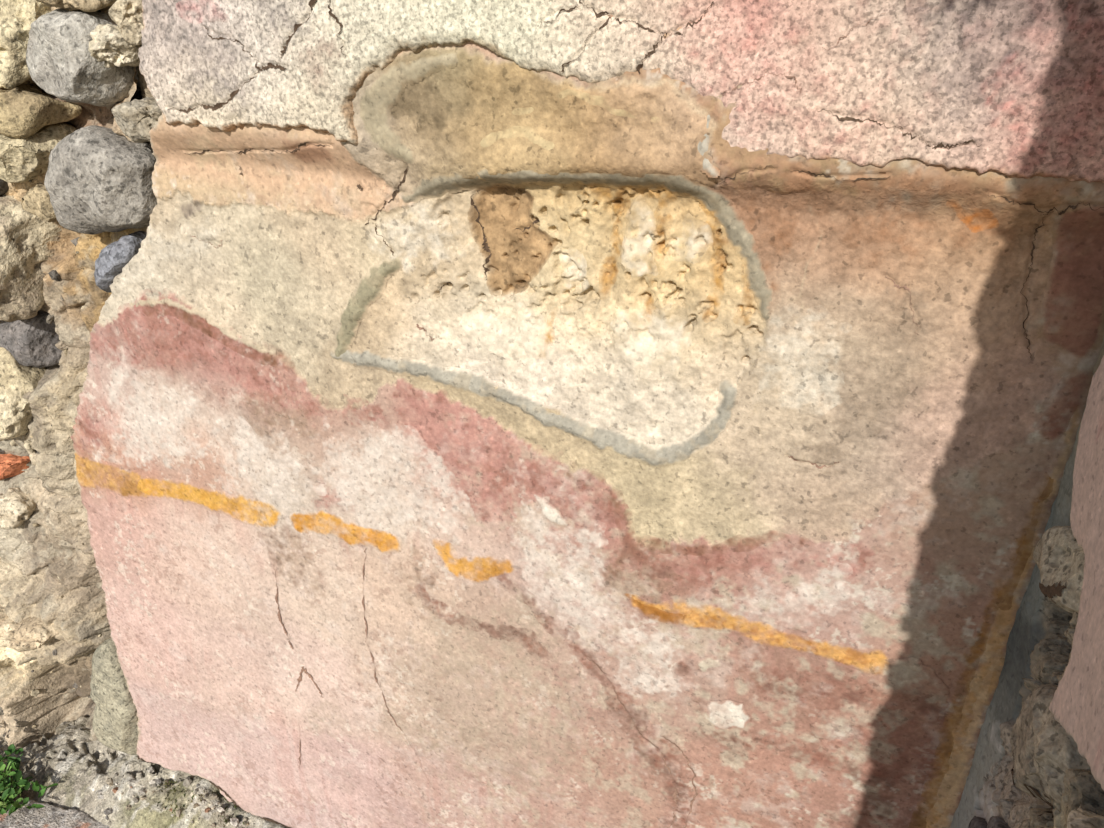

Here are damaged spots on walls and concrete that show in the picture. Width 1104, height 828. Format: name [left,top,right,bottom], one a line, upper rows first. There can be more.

crack [170,0,346,113]
crack [540,0,714,75]
peeling [90,44,1093,601]
crack [988,193,1104,358]
peeling [71,392,110,456]
crack [275,574,323,698]